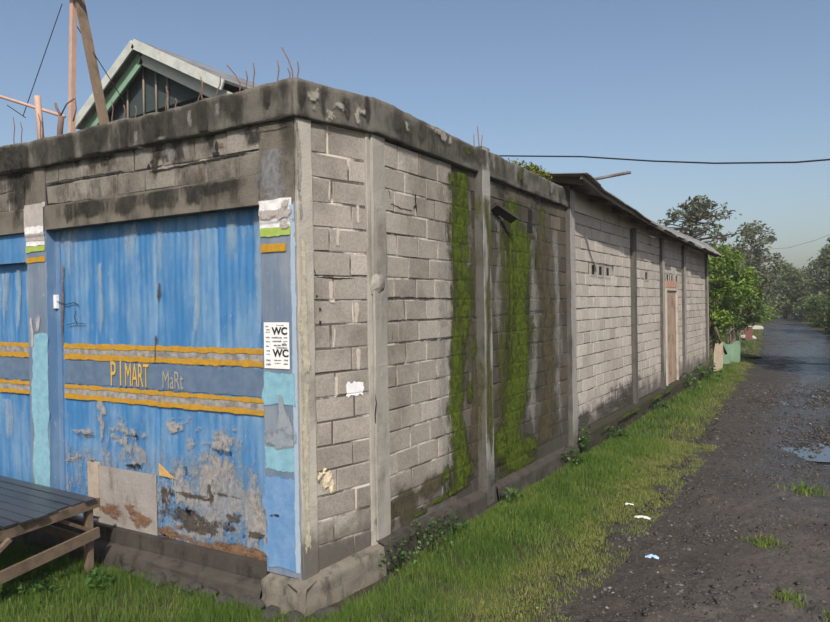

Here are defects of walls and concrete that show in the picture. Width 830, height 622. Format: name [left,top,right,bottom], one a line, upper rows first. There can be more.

leakage [0,124,115,213]
leakage [64,195,104,223]
leakage [117,175,236,215]
leakage [120,93,242,175]
leakage [257,148,284,201]
peeling [259,129,303,229]
leakage [263,81,306,107]
leakage [531,184,559,445]
peeling [72,392,147,470]
peeling [166,418,189,433]
peeling [157,428,266,558]
peeling [264,384,311,552]